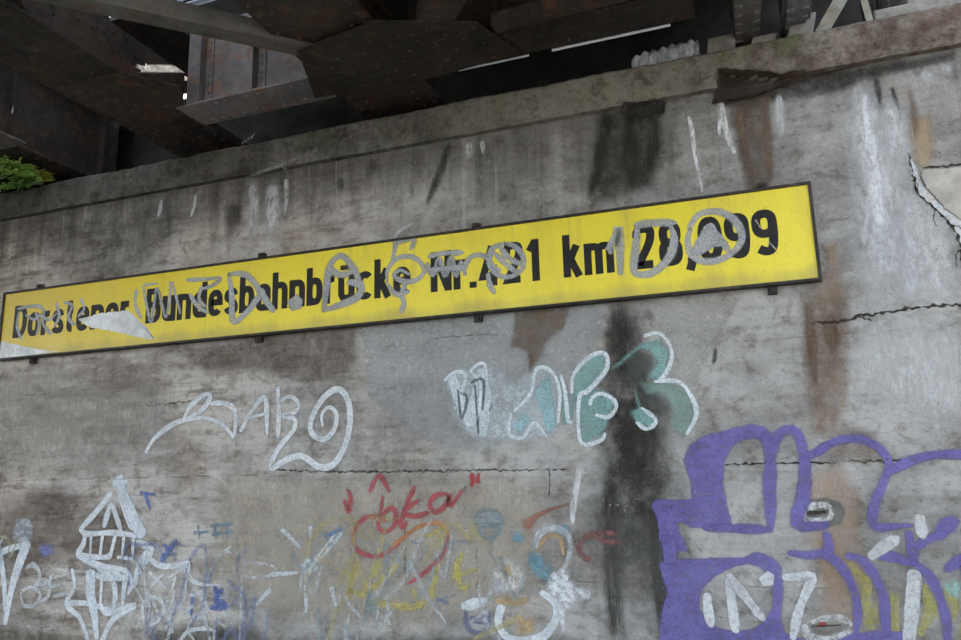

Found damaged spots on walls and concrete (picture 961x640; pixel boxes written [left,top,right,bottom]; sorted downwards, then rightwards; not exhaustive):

water stain [590,113,660,199]
crack [907,153,961,267]
flaking render [908,159,961,242]
crack [811,303,961,325]
corrosion [804,294,844,430]
crack [277,468,567,510]
water stain [601,311,670,631]
crack [725,458,911,466]